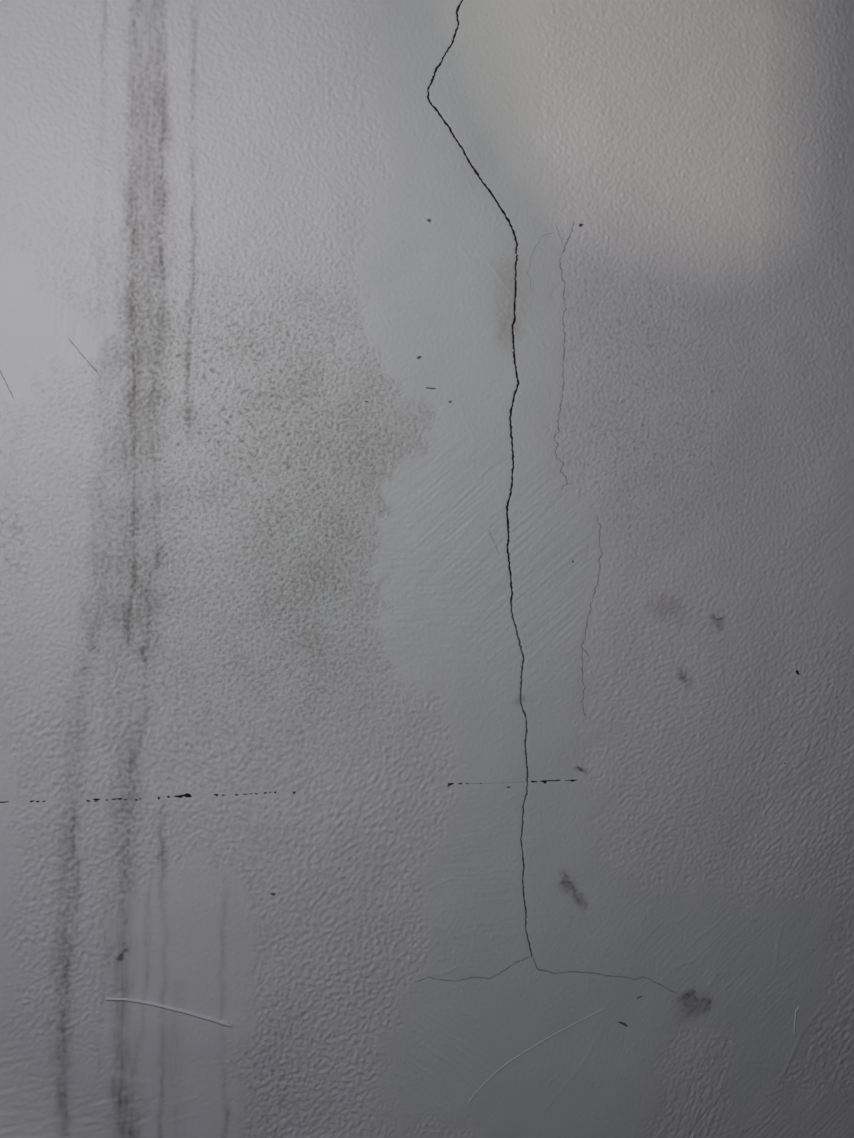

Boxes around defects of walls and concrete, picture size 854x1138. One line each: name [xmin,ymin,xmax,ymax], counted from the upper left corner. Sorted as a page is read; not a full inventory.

crack [414,0,677,994]